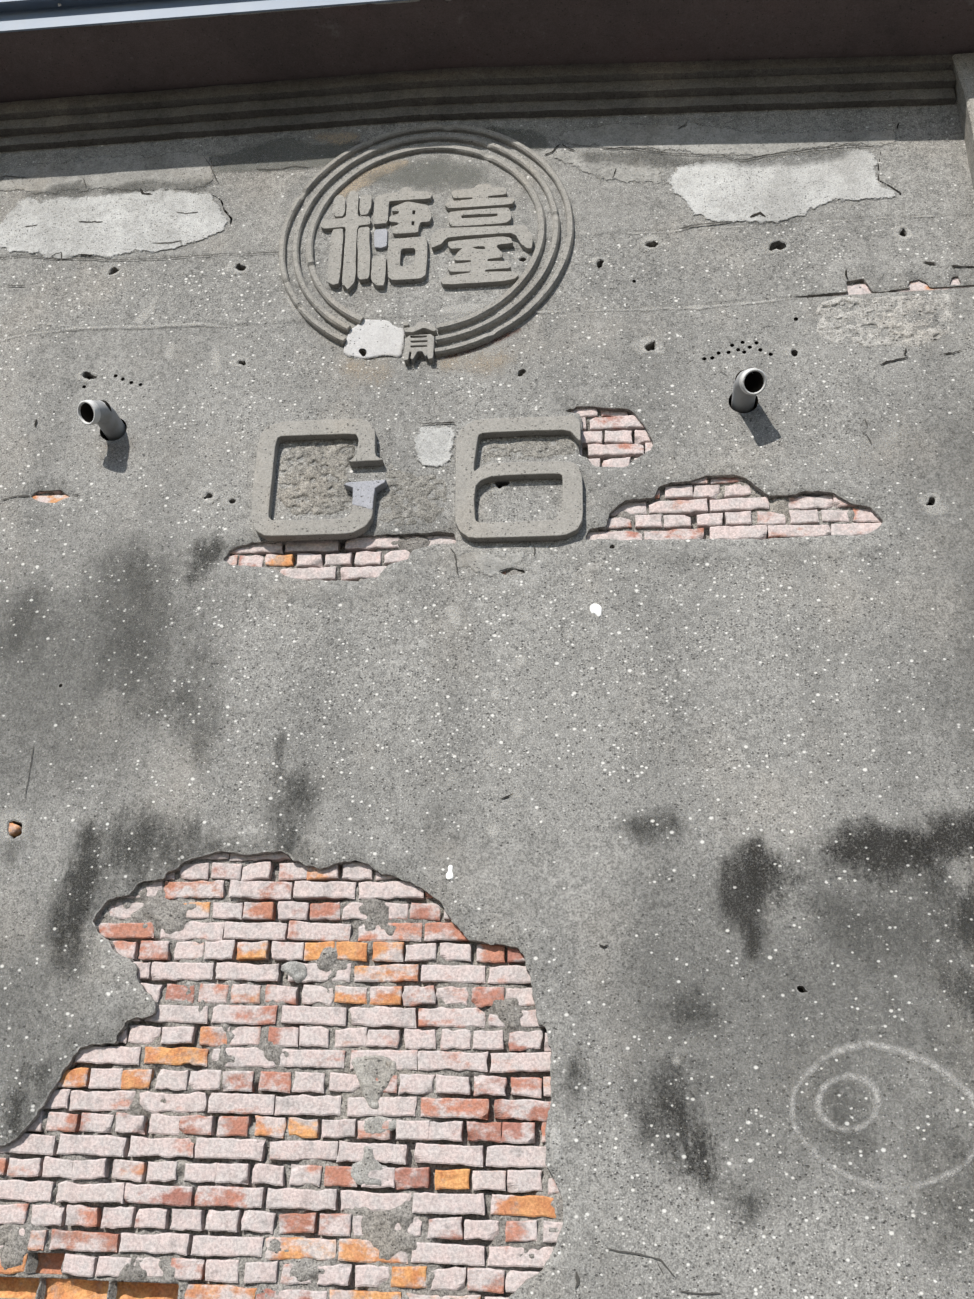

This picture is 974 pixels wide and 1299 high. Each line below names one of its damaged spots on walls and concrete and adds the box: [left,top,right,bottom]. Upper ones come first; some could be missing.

flaking render [566,406,653,467]
water stain [187,537,223,583]
flaking render [223,531,527,581]
flaking render [586,475,884,549]
water stain [48,813,200,977]
water stain [270,774,316,850]
water stain [628,814,678,840]
water stain [719,836,807,959]
water stain [820,812,974,954]
flaking render [0,851,563,1299]
water stain [636,1063,717,1189]
water stain [791,1041,974,1190]